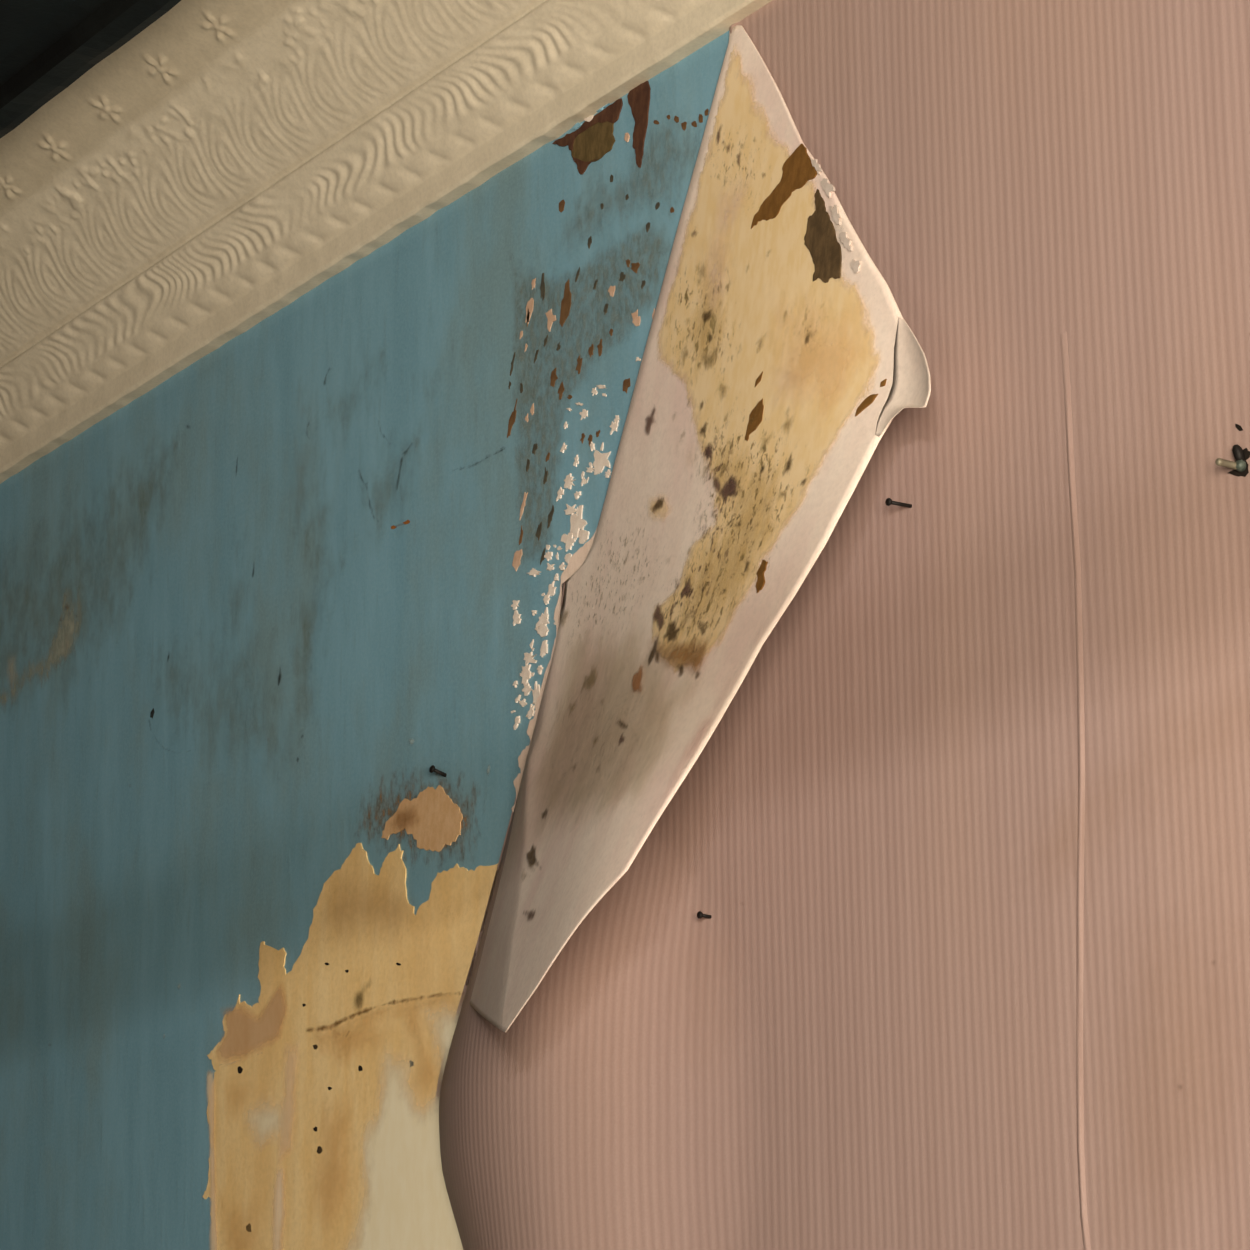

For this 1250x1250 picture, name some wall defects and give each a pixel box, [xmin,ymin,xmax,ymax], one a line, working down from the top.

peeling [552,81,651,175]
leakage [507,52,878,691]
peeling [511,385,621,730]
peeling [202,785,500,1250]
leakage [527,846,536,866]